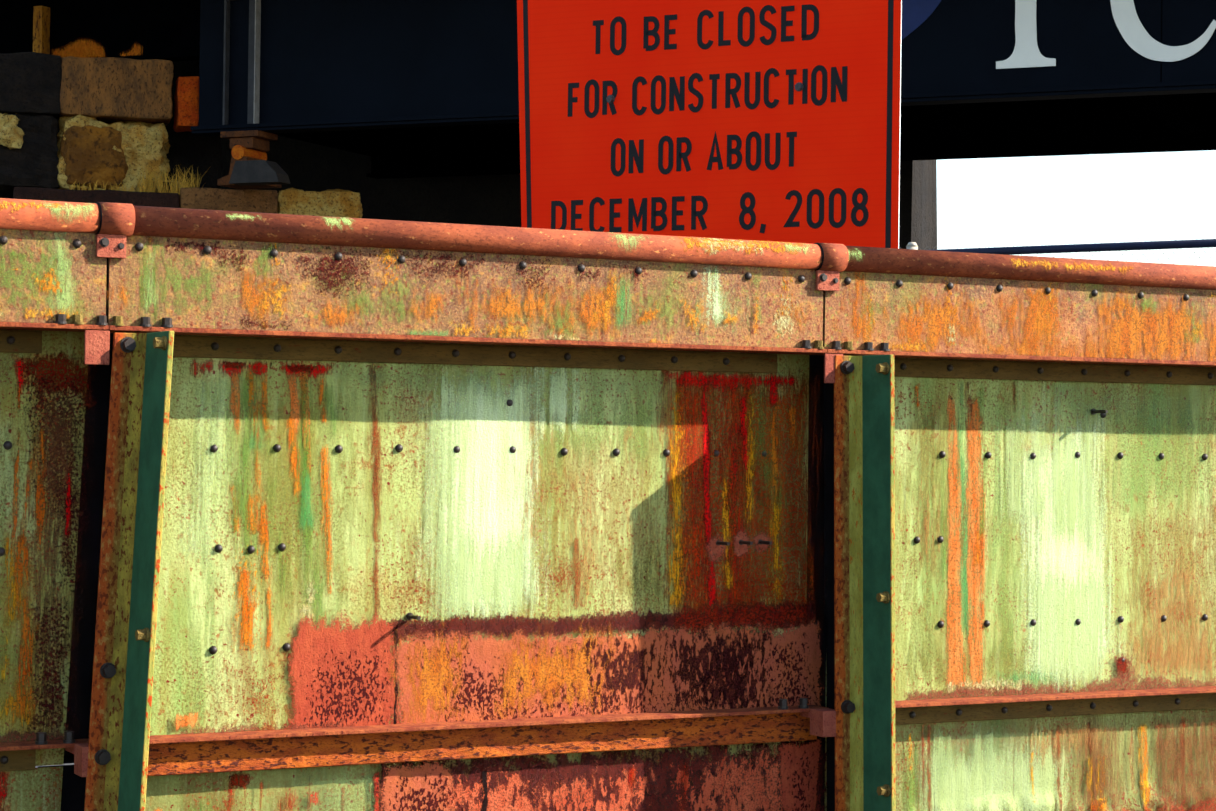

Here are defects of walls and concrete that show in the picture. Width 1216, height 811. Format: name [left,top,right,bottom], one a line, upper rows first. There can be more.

corrosion [319,248,443,327]
corrosion [459,270,628,339]
corrosion [889,258,1216,361]
corrosion [0,351,100,735]
corrosion [658,370,822,616]
corrosion [943,383,987,688]